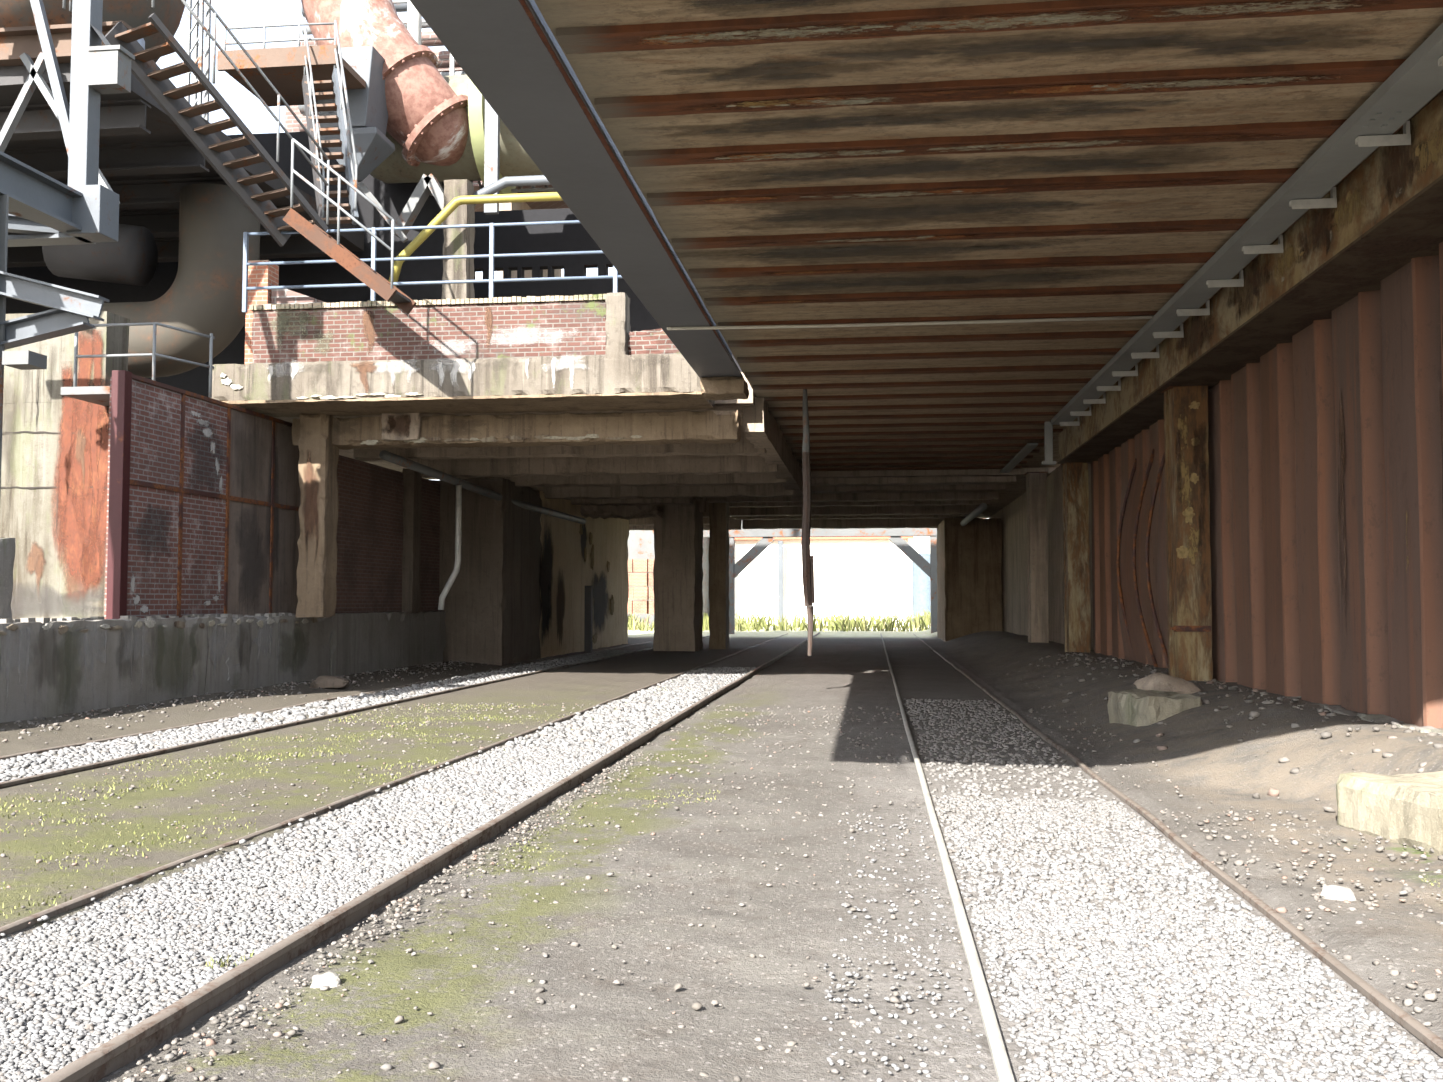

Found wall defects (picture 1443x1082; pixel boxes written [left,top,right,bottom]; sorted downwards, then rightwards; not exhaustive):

rust [639,0,1394,45]
rust [682,75,1323,111]
rust [718,134,1283,160]
rust [518,0,733,362]
rust [703,179,1236,202]
rust [750,229,1184,245]
rust [750,291,1127,303]
spalling [220,373,243,390]
rust [27,331,109,596]
leakage [539,525,565,644]